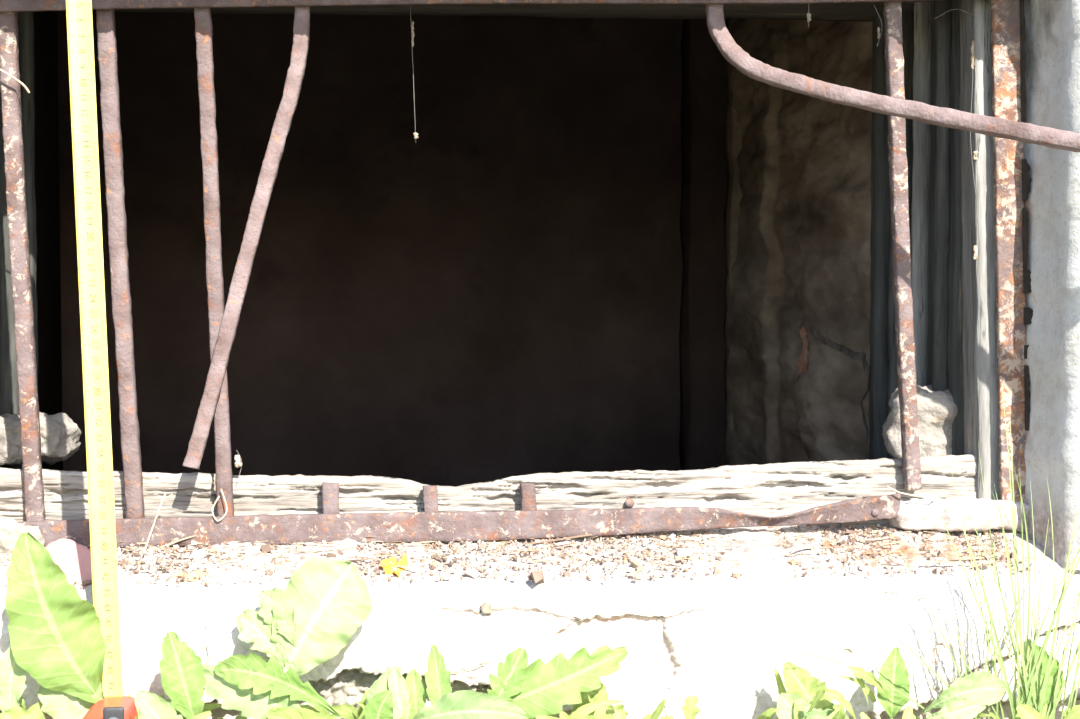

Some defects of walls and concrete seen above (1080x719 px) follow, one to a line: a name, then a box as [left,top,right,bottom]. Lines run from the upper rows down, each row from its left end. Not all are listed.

crack [441,606,584,625]
crack [657,609,704,619]
spalling [551,615,676,699]